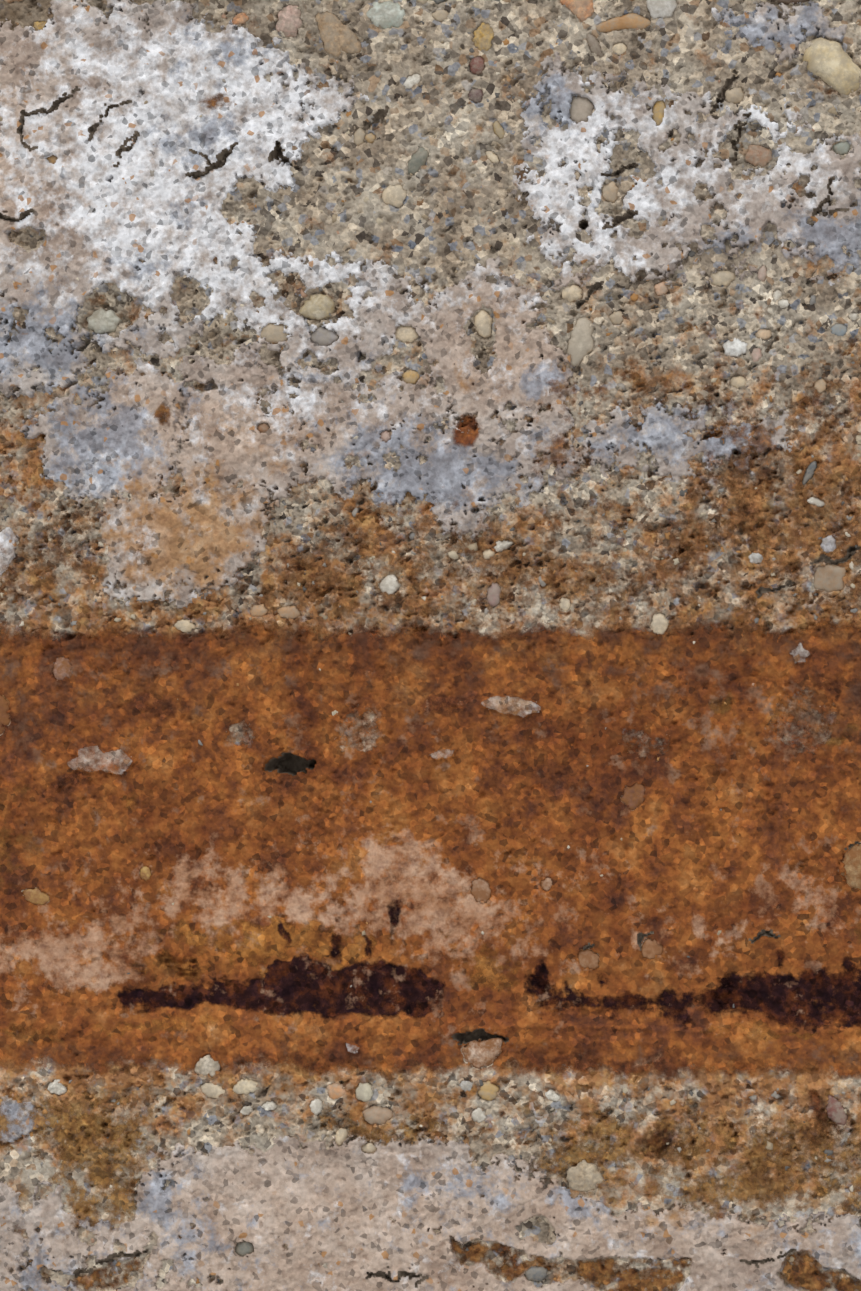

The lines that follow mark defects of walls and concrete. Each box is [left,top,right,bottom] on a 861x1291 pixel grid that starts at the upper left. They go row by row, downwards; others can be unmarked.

crack [17,86,140,167]
crack [185,142,238,179]
crack [268,140,303,171]
crack [0,208,35,222]
rust [0,383,861,1080]
leakage [387,900,401,933]
leakage [117,922,445,1018]
leakage [524,950,861,1032]
peeling [0,1095,50,1143]
rust [0,1093,150,1229]
peeling [0,1109,861,1291]
rust [534,1091,861,1224]